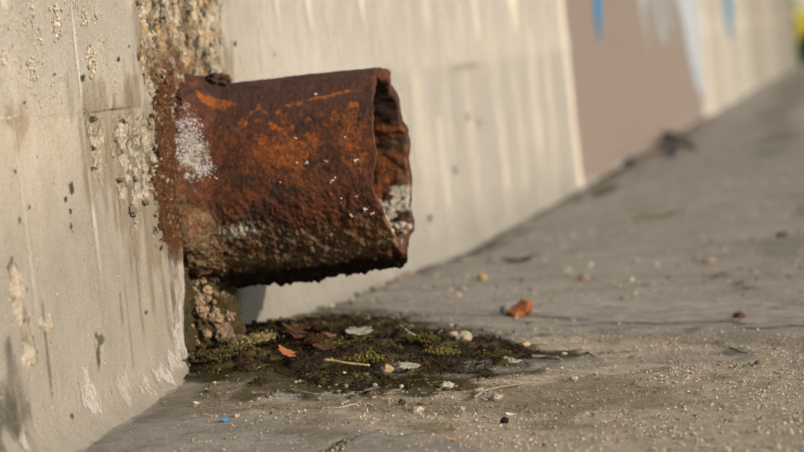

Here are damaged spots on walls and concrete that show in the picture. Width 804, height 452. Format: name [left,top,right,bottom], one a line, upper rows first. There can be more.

spalling [127,0,227,97]
corrosion [205,72,232,88]
corrosion [148,65,185,311]